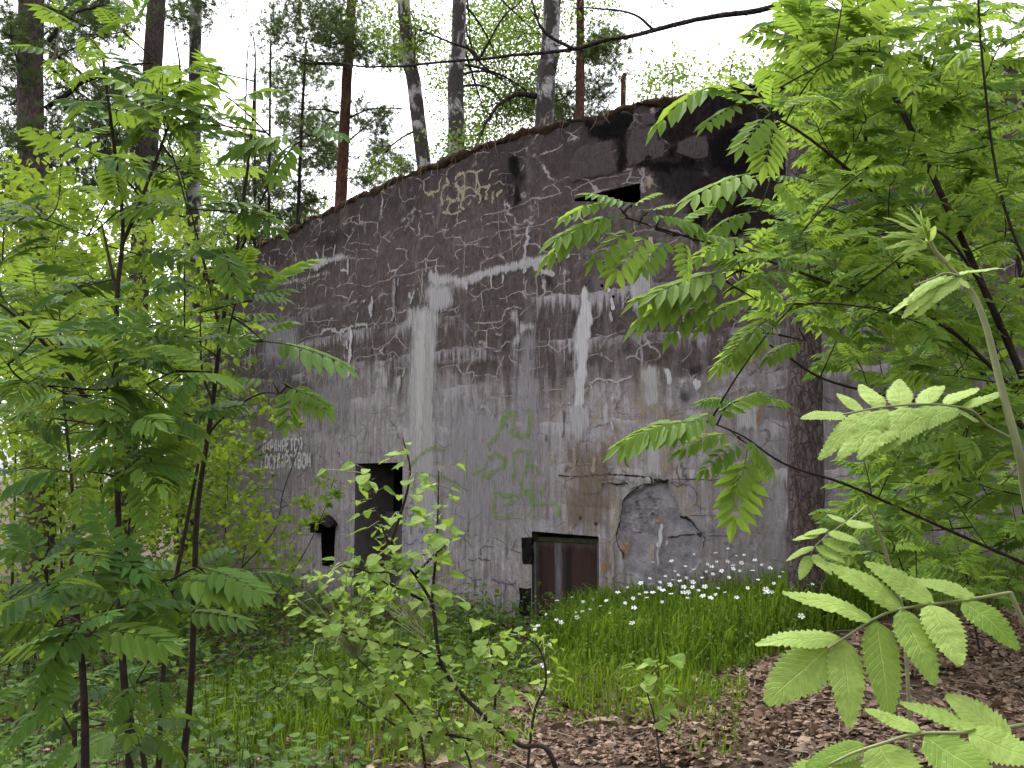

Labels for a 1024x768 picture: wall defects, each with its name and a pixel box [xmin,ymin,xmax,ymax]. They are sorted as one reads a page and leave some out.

water stain [502,154,523,207]
water stain [584,81,787,244]
water stain [283,233,350,289]
water stain [357,278,399,320]
crack [280,169,640,370]
water stain [375,253,570,607]
crack [542,376,632,407]
water stain [562,286,618,453]
crack [639,335,785,414]
crack [451,538,520,598]
crack [559,473,741,558]
spalling [617,481,706,587]